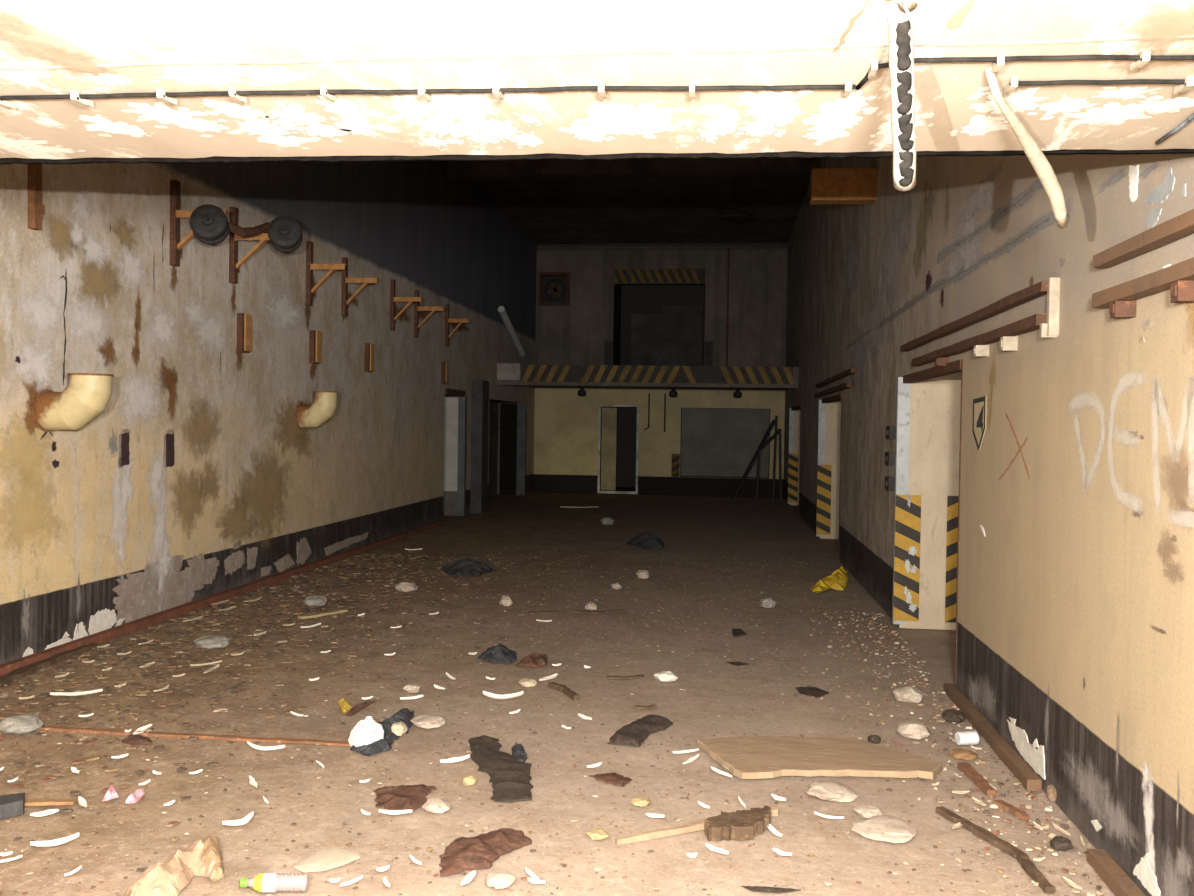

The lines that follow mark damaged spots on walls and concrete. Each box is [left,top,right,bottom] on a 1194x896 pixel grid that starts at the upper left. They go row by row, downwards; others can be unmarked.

peeling [75,94,386,149]
peeling [693,85,892,146]
peeling [949,86,1194,137]
damp [16,188,144,389]
rust [25,383,46,433]
damp [217,405,308,541]
damp [111,461,133,561]
damp [150,455,217,593]
damp [21,600,30,638]
peeling [23,532,369,671]
spalling [1007,717,1046,780]
spalling [1133,852,1161,896]